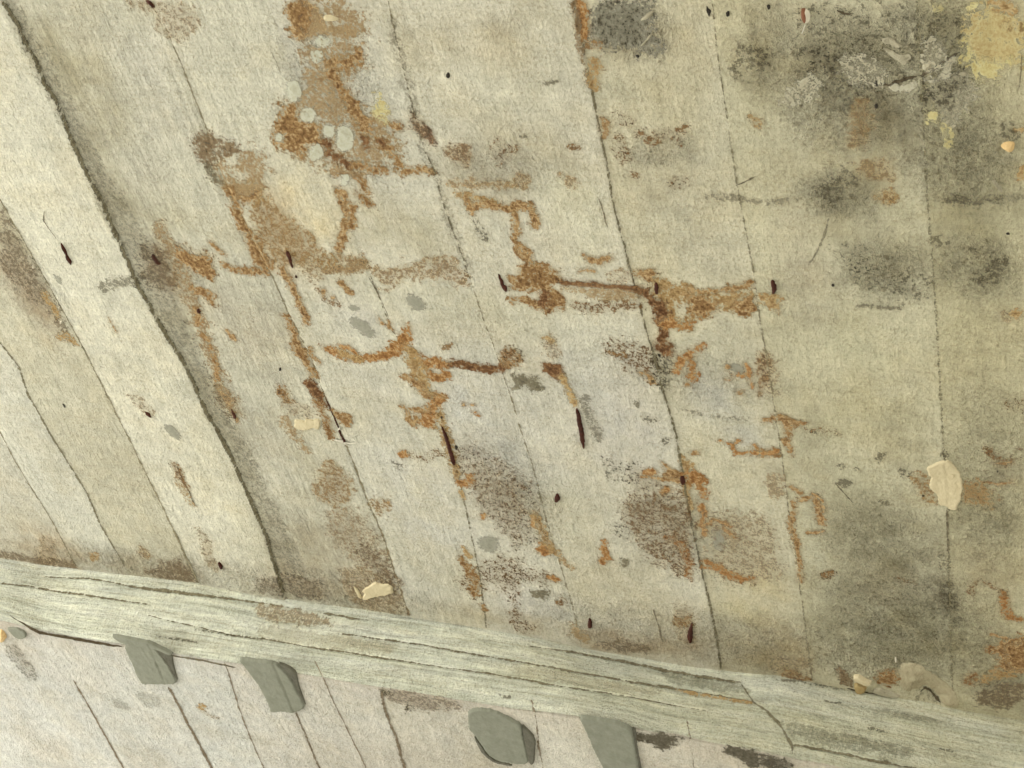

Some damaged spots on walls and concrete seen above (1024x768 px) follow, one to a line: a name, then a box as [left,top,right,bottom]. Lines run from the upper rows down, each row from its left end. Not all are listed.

spalling [882,37,911,65]
peeling [955,0,1024,84]
leakage [925,111,954,149]
rust [152,0,785,632]
peeling [294,418,321,430]
rust [718,413,839,459]
peeling [926,460,963,510]
rust [619,450,827,585]
peeling [354,582,394,600]
rust [963,578,1024,710]